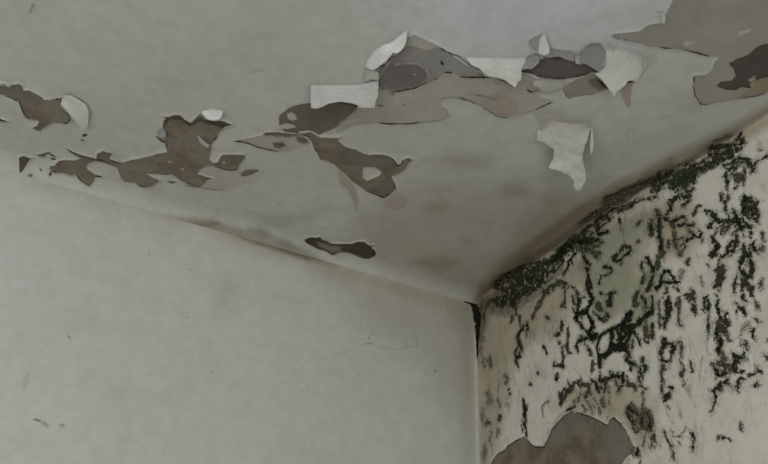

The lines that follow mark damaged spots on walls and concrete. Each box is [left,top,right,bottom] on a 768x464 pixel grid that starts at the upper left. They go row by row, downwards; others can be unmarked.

peeling [0,79,89,141]
peeling [16,0,768,211]
peeling [302,235,378,260]
mould [465,129,768,464]
flaking render [490,404,636,464]